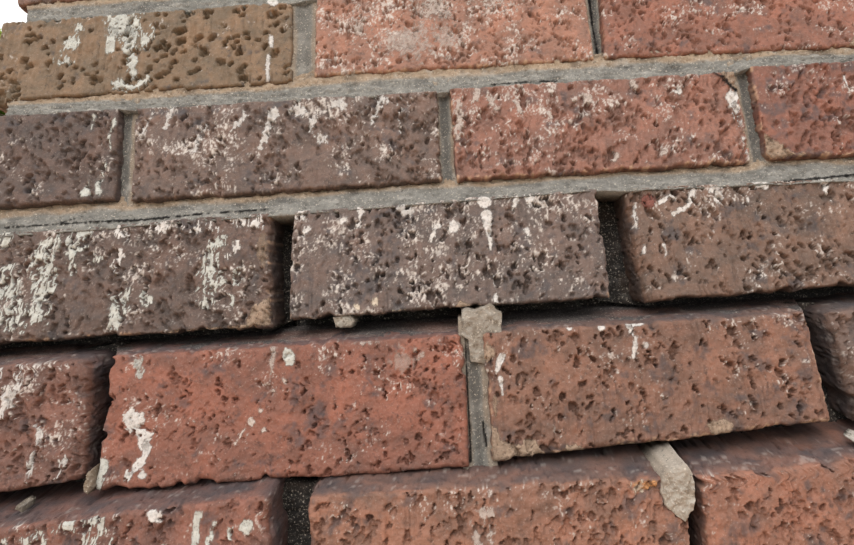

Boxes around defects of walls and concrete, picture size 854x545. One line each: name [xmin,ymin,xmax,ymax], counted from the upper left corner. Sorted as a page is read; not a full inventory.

spalling [491,396,545,461]